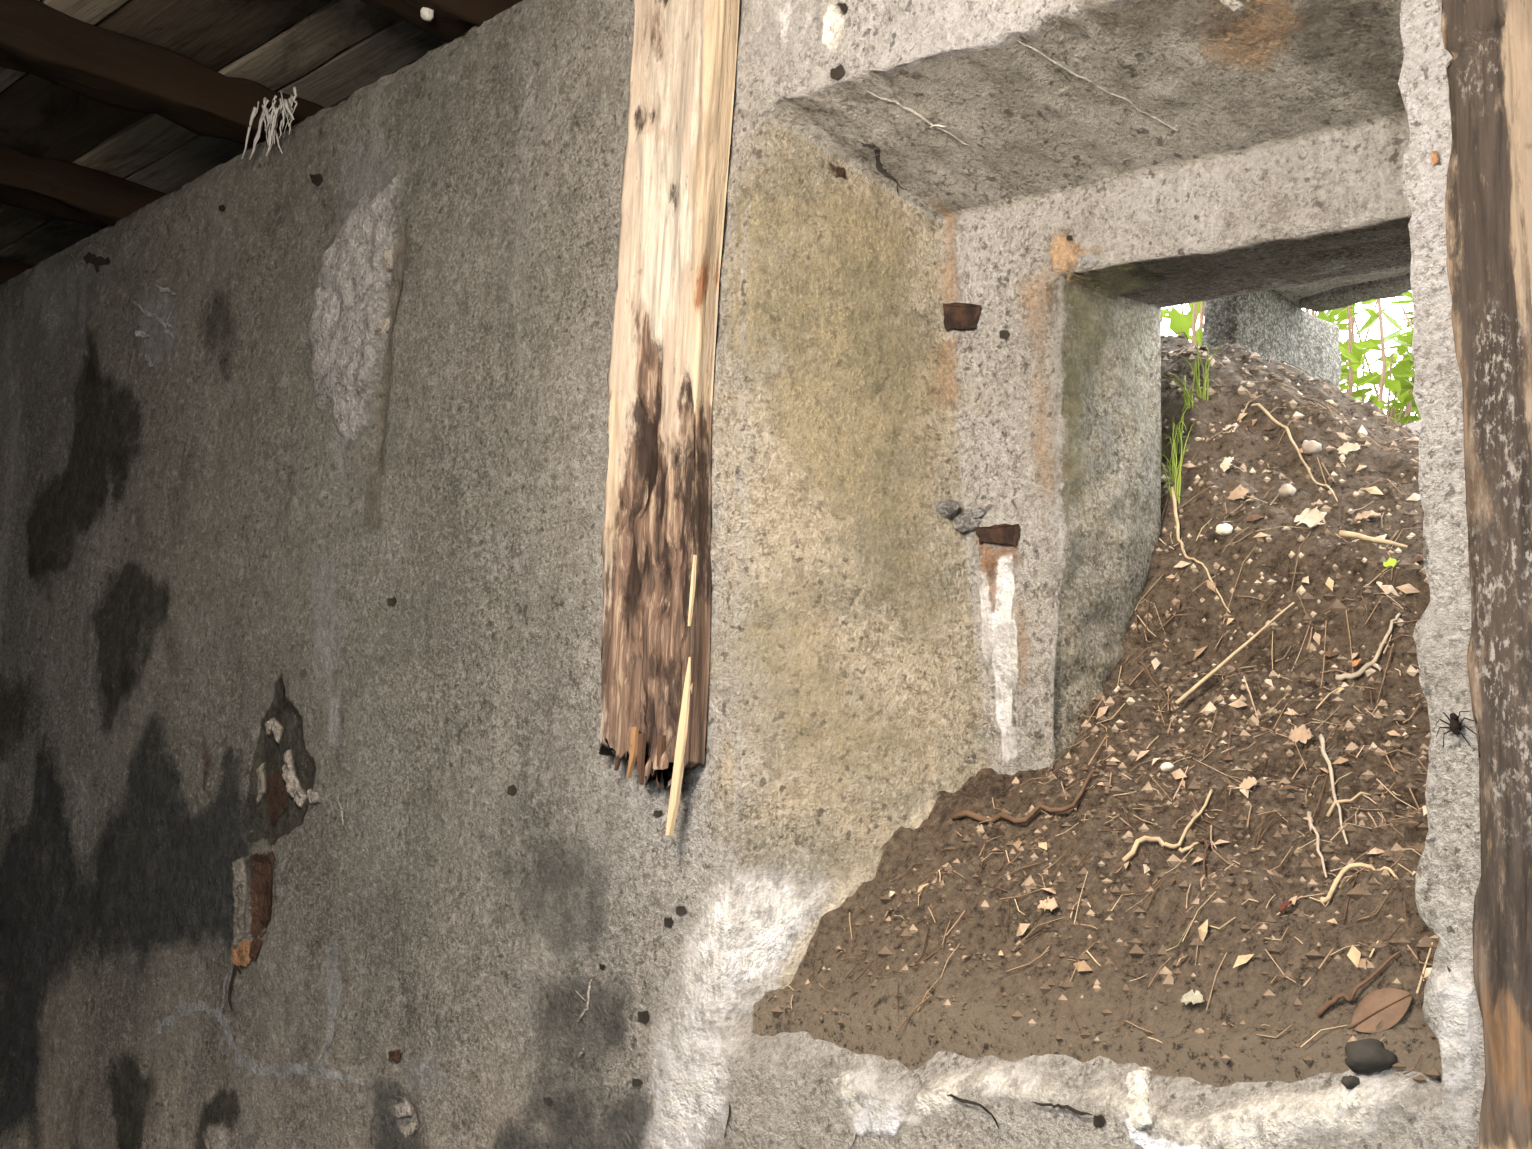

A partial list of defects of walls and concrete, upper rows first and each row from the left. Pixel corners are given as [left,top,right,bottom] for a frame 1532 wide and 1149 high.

peeling [777,0,790,39]
peeling [809,3,847,80]
leakage [26,334,140,581]
peeling [242,673,320,845]
leakage [911,804,933,829]
leakage [0,721,251,1149]
leakage [495,860,880,1149]
leakage [287,1063,419,1149]